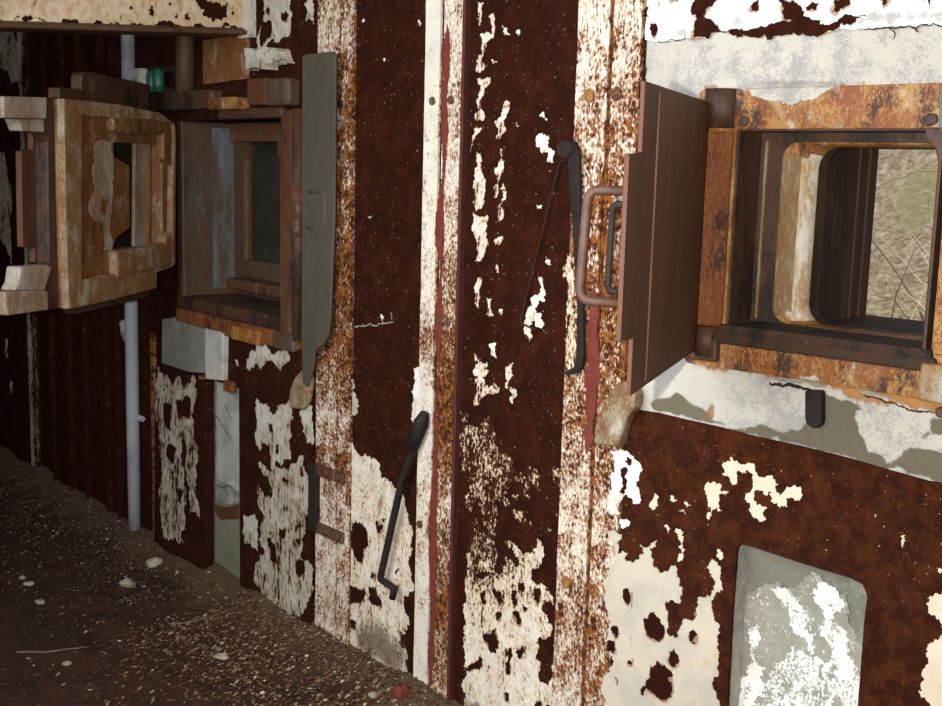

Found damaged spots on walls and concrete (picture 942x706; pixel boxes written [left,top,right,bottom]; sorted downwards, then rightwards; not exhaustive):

rust [89,196,107,254]
peeling [470,2,520,262]
peeling [524,276,546,341]
peeling [535,133,555,163]
peeling [155,367,200,544]
peeling [243,399,315,617]
peeling [350,443,415,672]
peeling [459,342,561,706]
peeling [601,449,724,706]
peeling [704,457,803,522]
rust [822,384,942,412]
peeling [918,593,942,706]